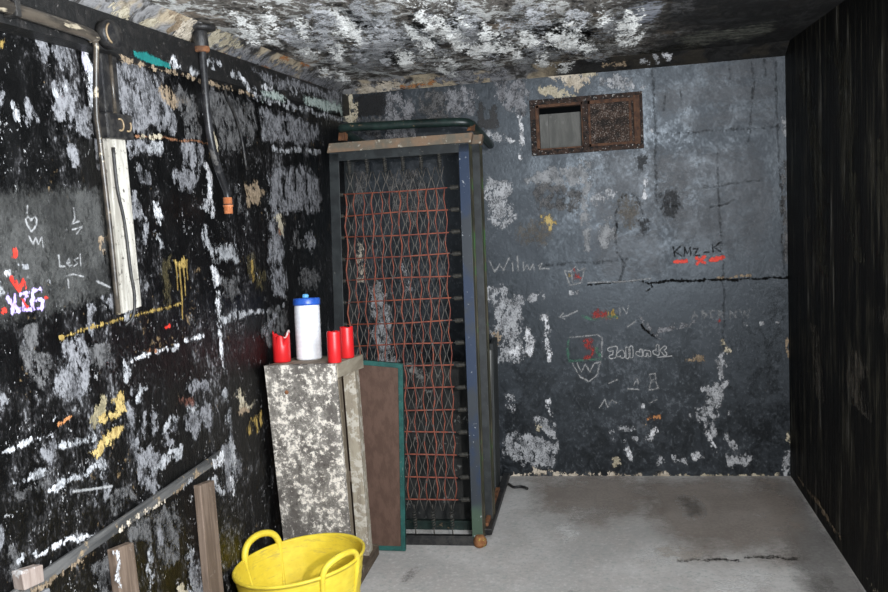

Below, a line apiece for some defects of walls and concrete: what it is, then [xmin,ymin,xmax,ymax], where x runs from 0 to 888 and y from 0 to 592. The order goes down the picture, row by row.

crack [617,195,640,230]
crack [587,274,788,291]
crack [629,317,695,339]
crack [657,547,798,562]